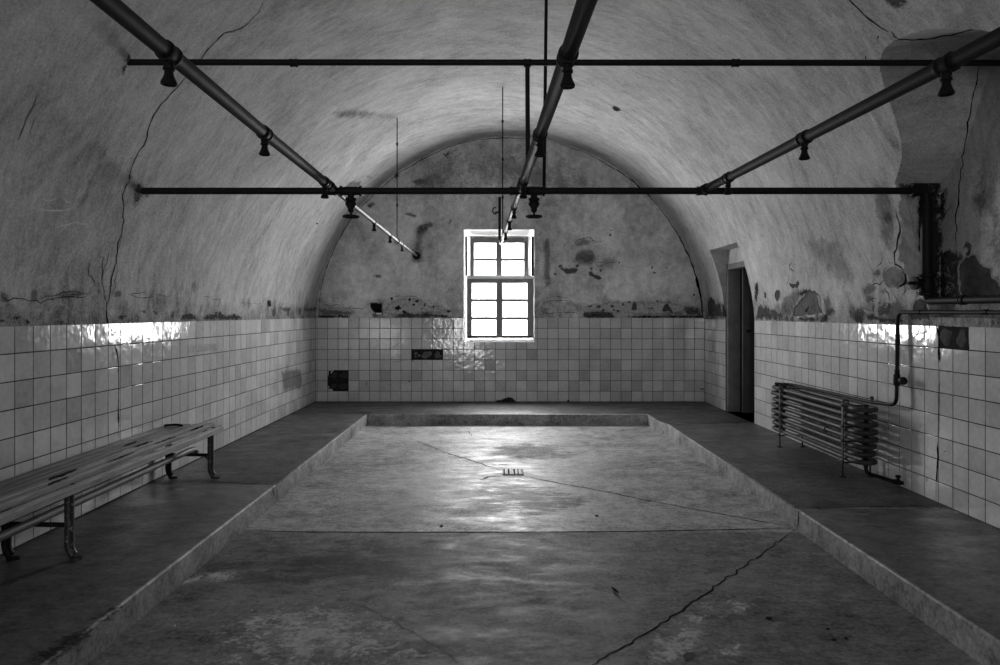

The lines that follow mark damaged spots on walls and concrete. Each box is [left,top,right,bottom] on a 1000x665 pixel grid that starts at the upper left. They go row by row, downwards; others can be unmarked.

crack [201,1,264,59]
crack [849,0,984,41]
crack [939,67,980,261]
crack [88,78,185,423]
peeling [326,296,450,315]
flaking render [789,281,823,318]
flaking render [861,198,970,351]
leakage [913,183,962,297]
flaking render [957,241,1000,305]
peeling [327,370,349,391]
peeling [412,349,443,362]
crack [387,428,799,665]